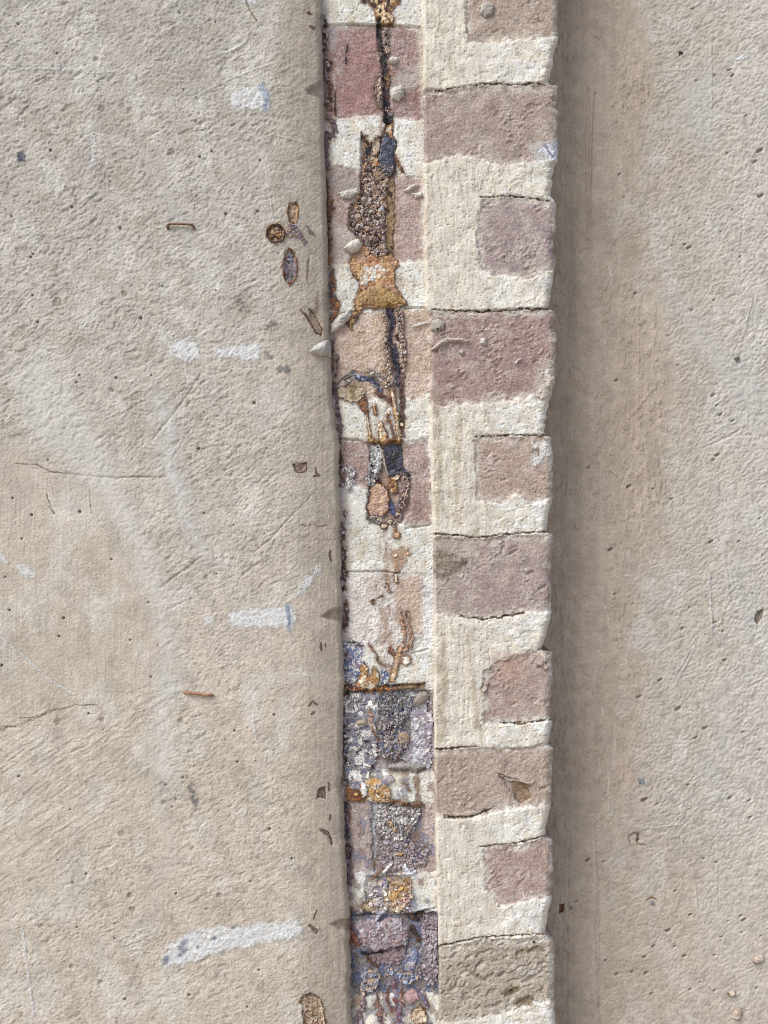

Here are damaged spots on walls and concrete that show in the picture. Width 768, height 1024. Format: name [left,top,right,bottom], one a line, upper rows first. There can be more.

crack [374,21,392,125]
corrosion [265,14,408,330]
spalling [347,163,395,257]
spalling [336,368,396,403]
crack [16,463,91,514]
spalling [341,443,411,525]
spalling [343,690,434,790]
spalling [350,801,439,996]